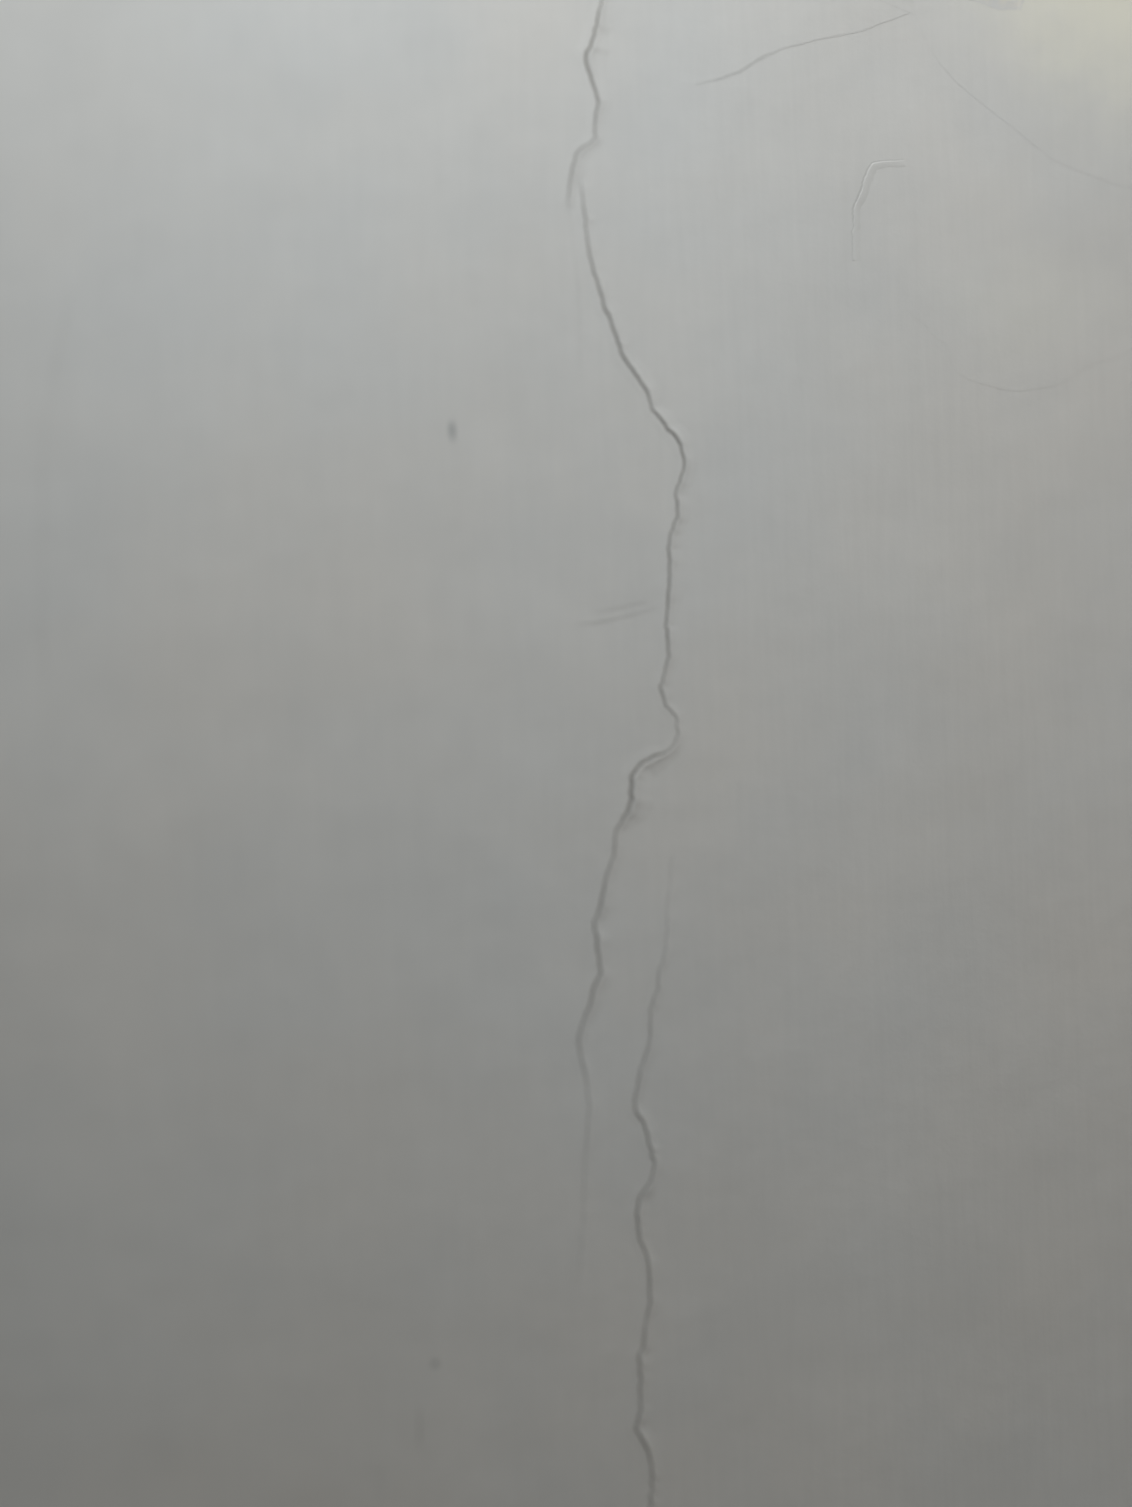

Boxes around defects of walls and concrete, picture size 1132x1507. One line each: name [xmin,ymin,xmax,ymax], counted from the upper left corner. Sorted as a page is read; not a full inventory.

crack [559,0,698,1282]